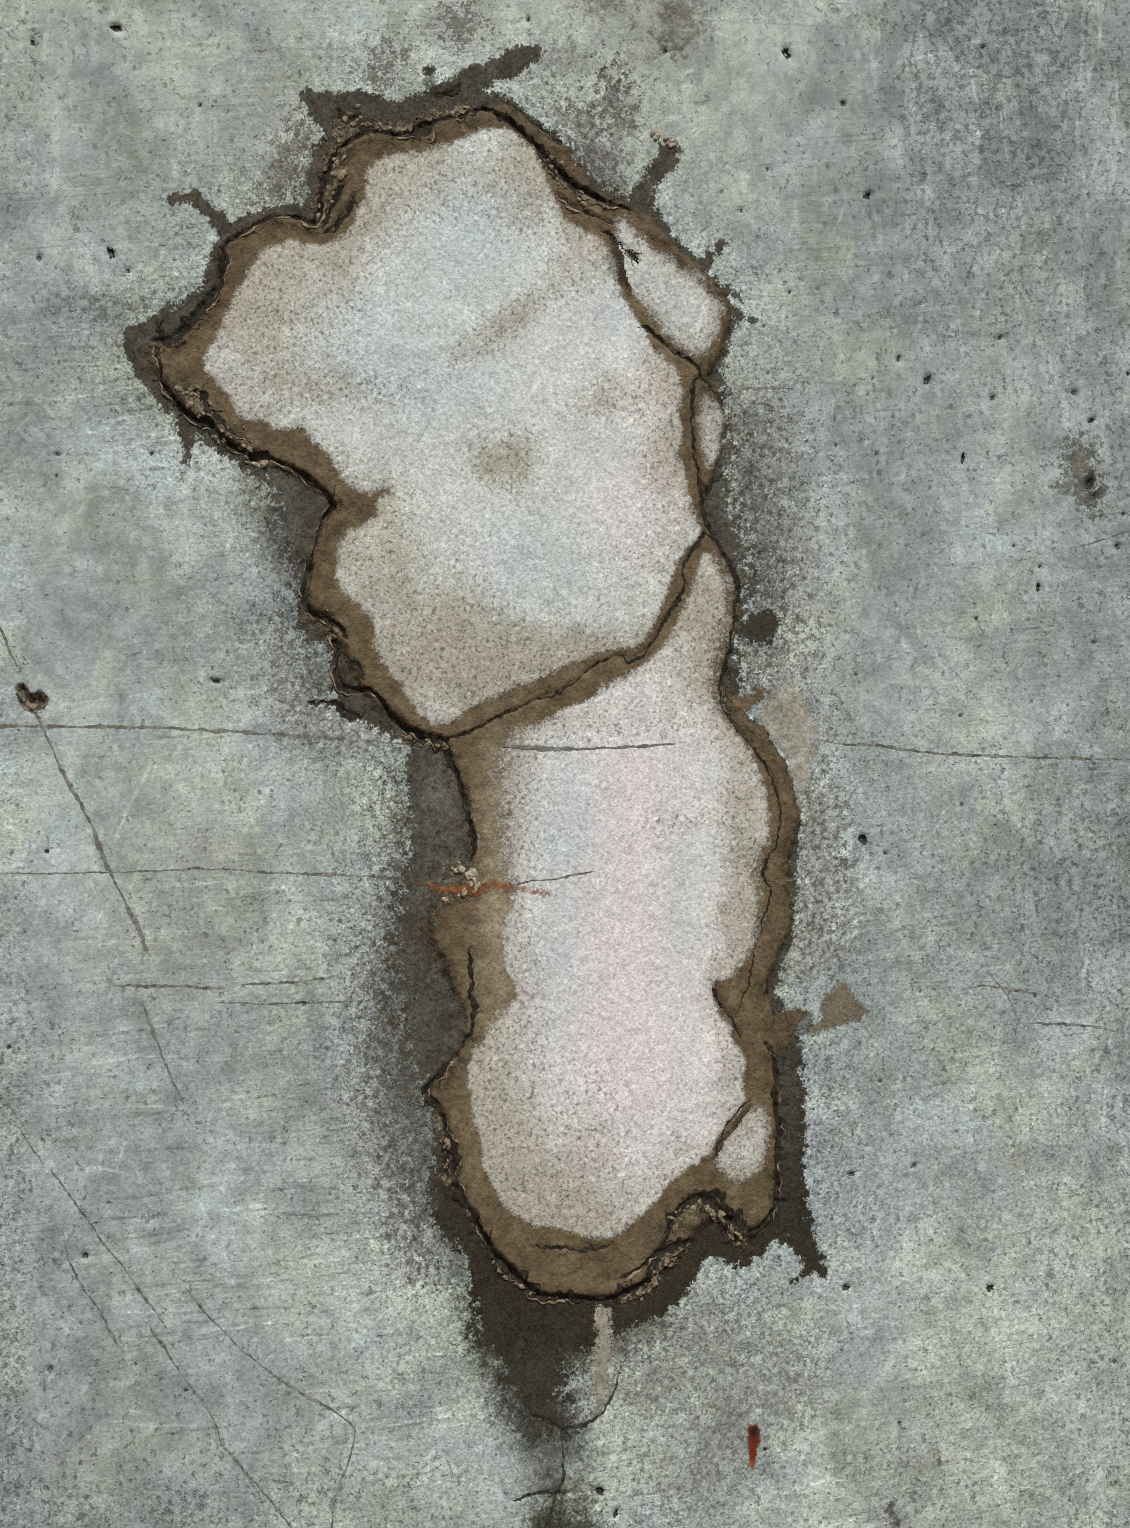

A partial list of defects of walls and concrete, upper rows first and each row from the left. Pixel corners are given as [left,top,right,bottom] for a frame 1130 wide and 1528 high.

spalling [307,99,478,222]
spalling [169,378,268,473]
crack [0,82,791,1375]
damp [122,43,870,1528]
spalling [434,858,486,905]
corrosion [425,881,549,909]
spalling [430,1113,462,1186]
spalling [621,1193,748,1308]
crack [3,1097,293,1528]
crack [186,1288,356,1528]
crack [512,1376,624,1528]
corrosion [747,1424,761,1469]